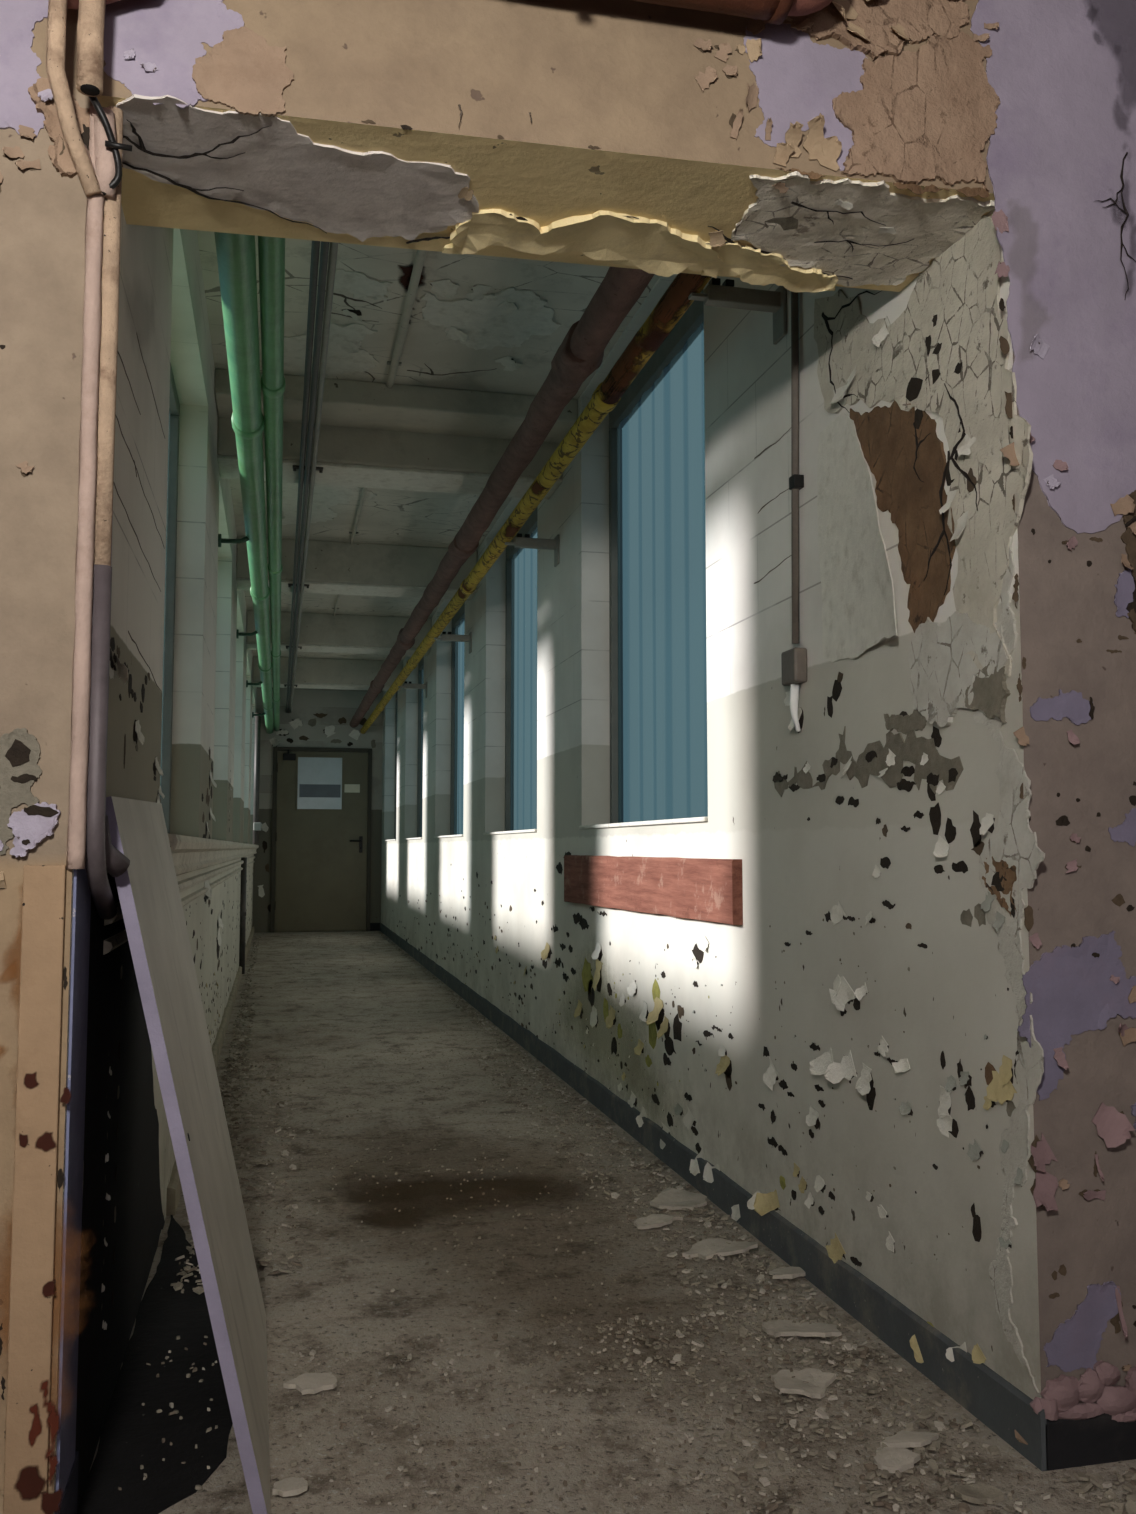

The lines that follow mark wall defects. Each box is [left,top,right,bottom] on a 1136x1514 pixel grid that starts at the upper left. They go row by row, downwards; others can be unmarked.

peeling [0,0,90,193]
crack [122,119,327,234]
crack [1093,152,1136,298]
crack [706,201,914,412]
peeling [827,672,843,718]
peeling [952,861,968,873]
peeling [829,958,876,1016]
peeling [397,872,737,1229]
peeling [731,1026,910,1221]
peeling [937,1059,975,1138]
peeling [1079,1102,1136,1200]
peeling [948,1203,982,1242]